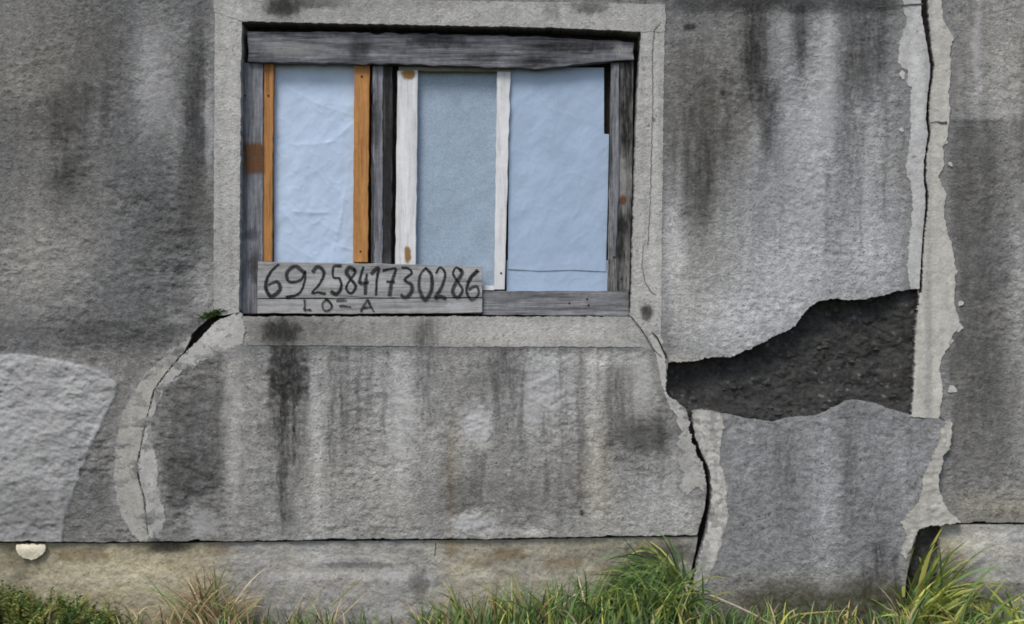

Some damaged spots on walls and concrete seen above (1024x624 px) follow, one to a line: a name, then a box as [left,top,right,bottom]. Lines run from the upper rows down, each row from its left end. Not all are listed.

crack [874,0,947,254]
crack [136,310,242,532]
leakage [267,321,309,431]
crack [685,406,709,595]
spalling [665,289,917,439]